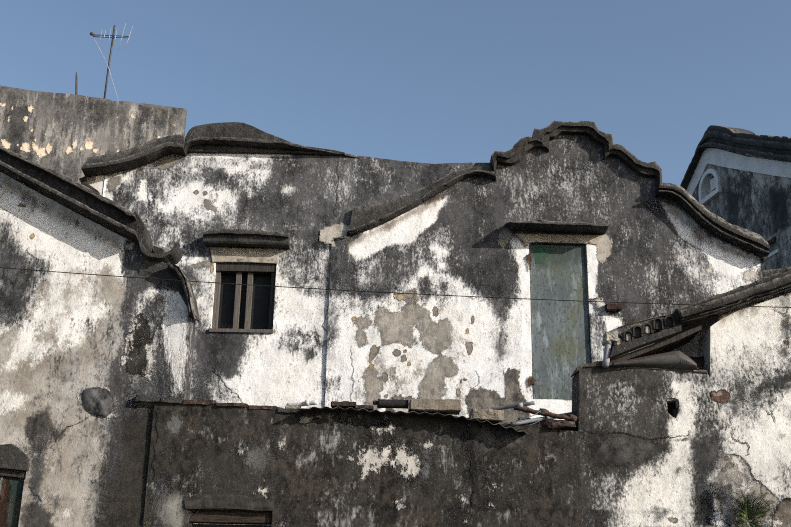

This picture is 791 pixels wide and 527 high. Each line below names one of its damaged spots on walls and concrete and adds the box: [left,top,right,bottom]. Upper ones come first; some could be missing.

peeling [1,105,52,158]
peeling [64,139,99,154]
leakage [0,240,33,312]
leakage [419,278,447,299]
flaking render [352,288,531,424]
spalling [710,389,730,403]
leakage [103,412,153,527]
leakage [462,420,529,507]
leakage [688,435,723,526]
spalling [714,455,791,527]